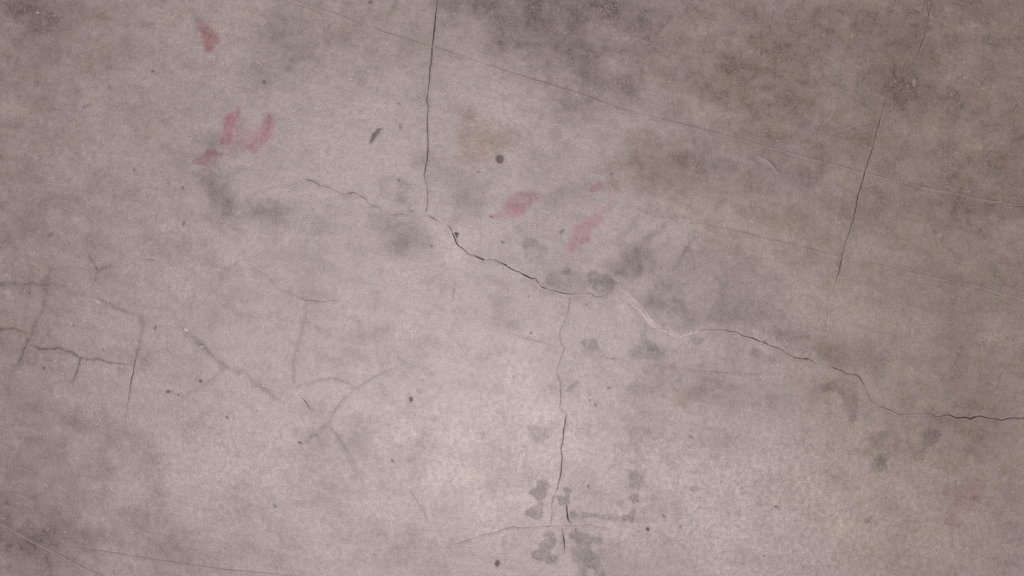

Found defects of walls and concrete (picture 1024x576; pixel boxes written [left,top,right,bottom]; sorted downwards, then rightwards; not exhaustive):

crack [0,250,428,477]
crack [255,0,1024,553]
damp [523,467,648,576]